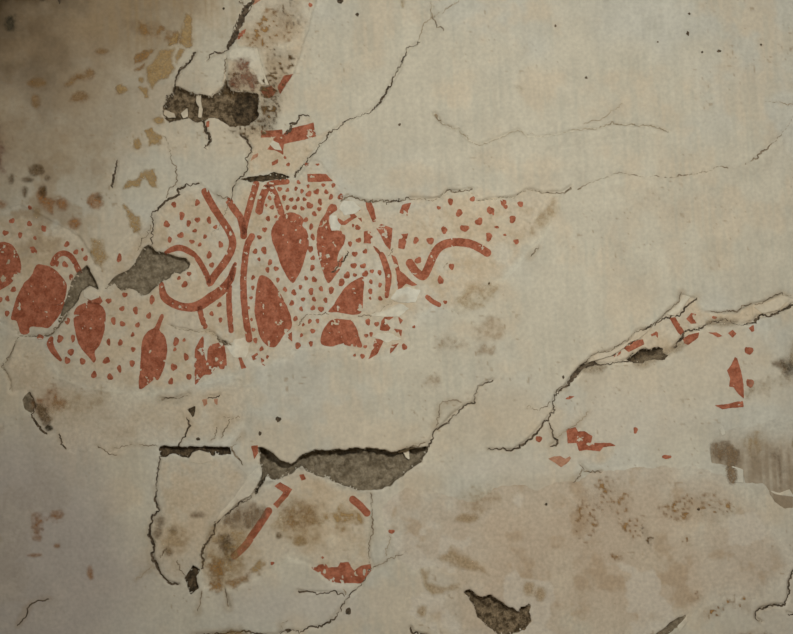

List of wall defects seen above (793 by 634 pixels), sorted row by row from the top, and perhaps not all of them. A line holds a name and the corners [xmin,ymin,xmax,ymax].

water stain [125,169,156,188]
water stain [134,117,164,149]
water stain [134,14,192,98]
crack [294,1,459,178]
flaking render [0,0,562,594]
crack [488,292,793,452]
flaking render [576,293,793,378]
crack [98,444,262,585]
crack [204,493,406,634]
flaking render [383,416,793,634]
water stain [713,442,739,483]
crack [749,570,793,634]